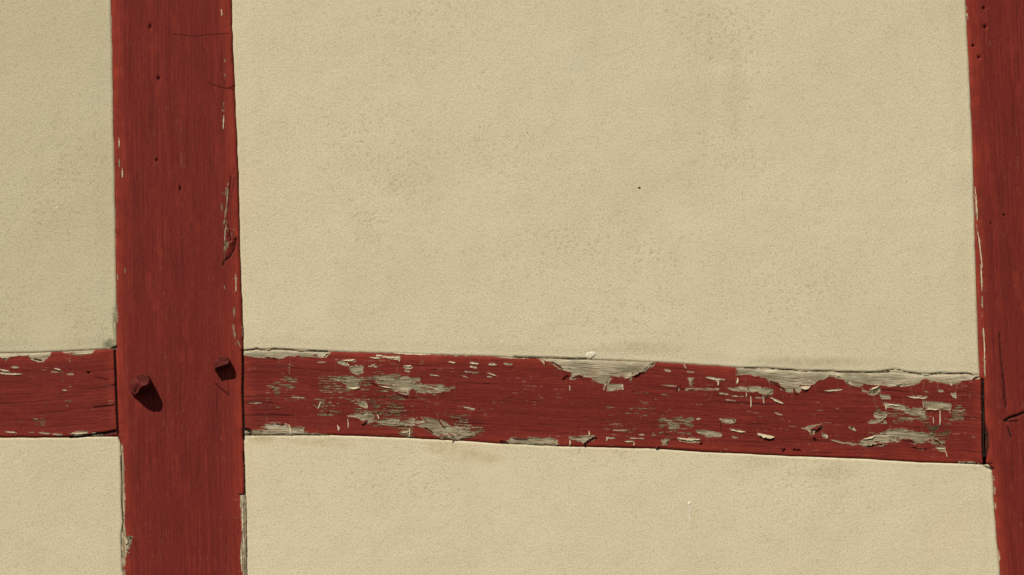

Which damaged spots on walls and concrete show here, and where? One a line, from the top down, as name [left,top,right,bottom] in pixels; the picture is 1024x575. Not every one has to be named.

peeling [0,350,102,436]
peeling [233,310,484,442]
peeling [449,357,801,451]